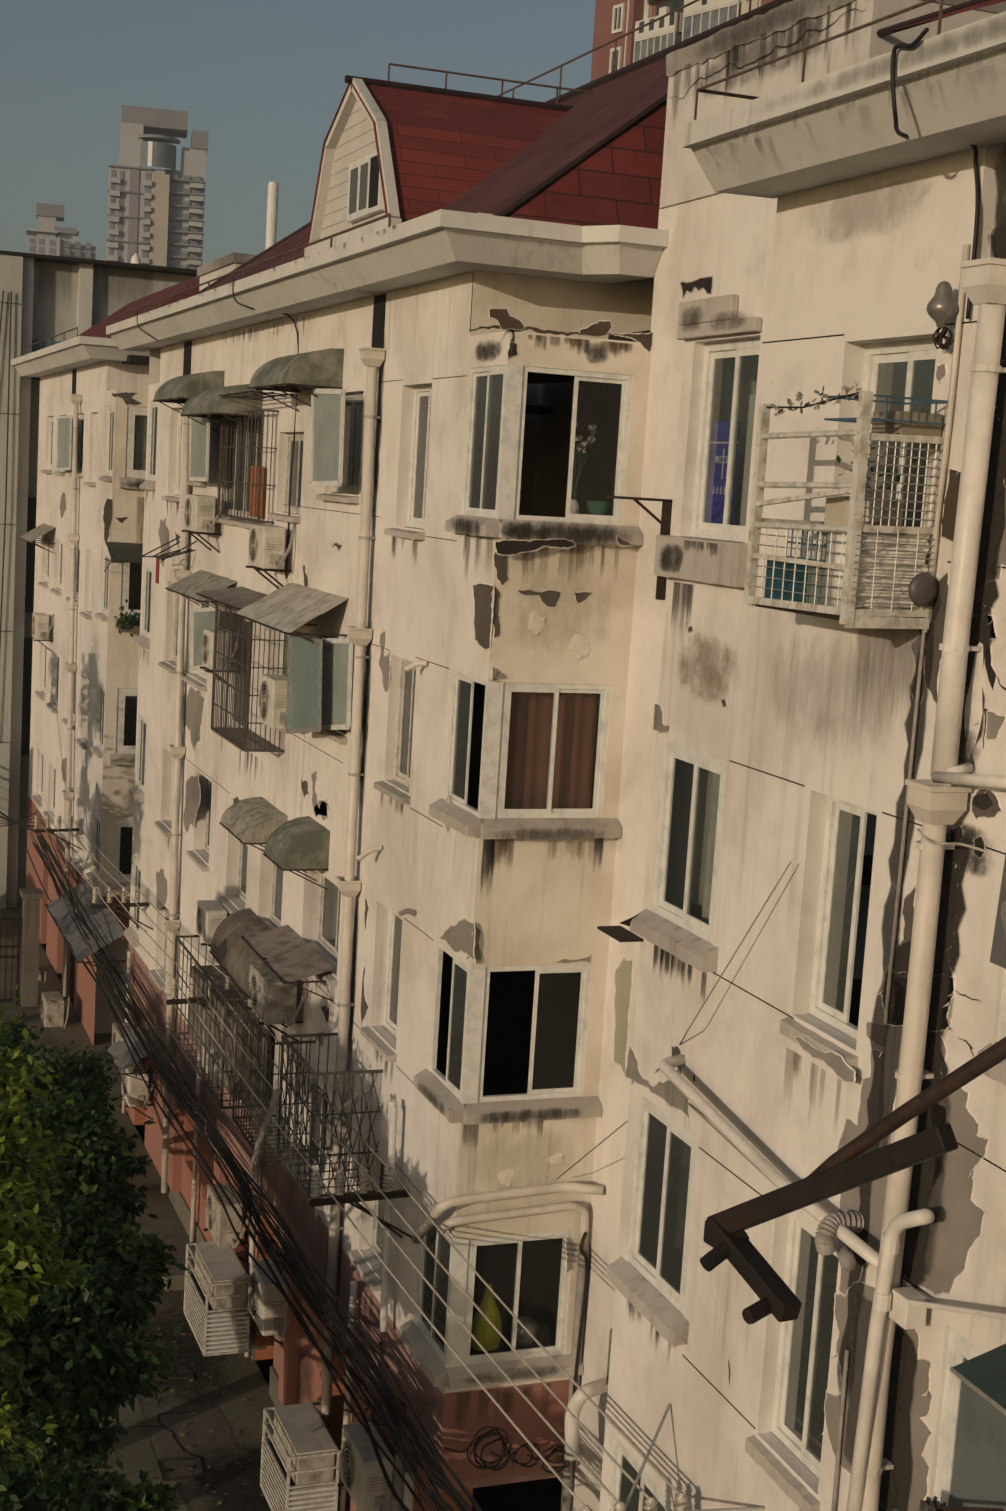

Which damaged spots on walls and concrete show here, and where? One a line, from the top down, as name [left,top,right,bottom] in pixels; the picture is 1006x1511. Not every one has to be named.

water stain [453,518,478,535]
spalling [472,538,593,681]
water stain [503,522,619,545]
spalling [910,571,949,705]
spalling [941,468,961,542]
spalling [973,477,1006,692]
spalling [985,709,1006,741]
spalling [949,787,1003,859]
spalling [439,918,483,964]
spalling [793,885,916,1151]
spalling [934,954,957,1074]
spalling [905,1087,991,1296]